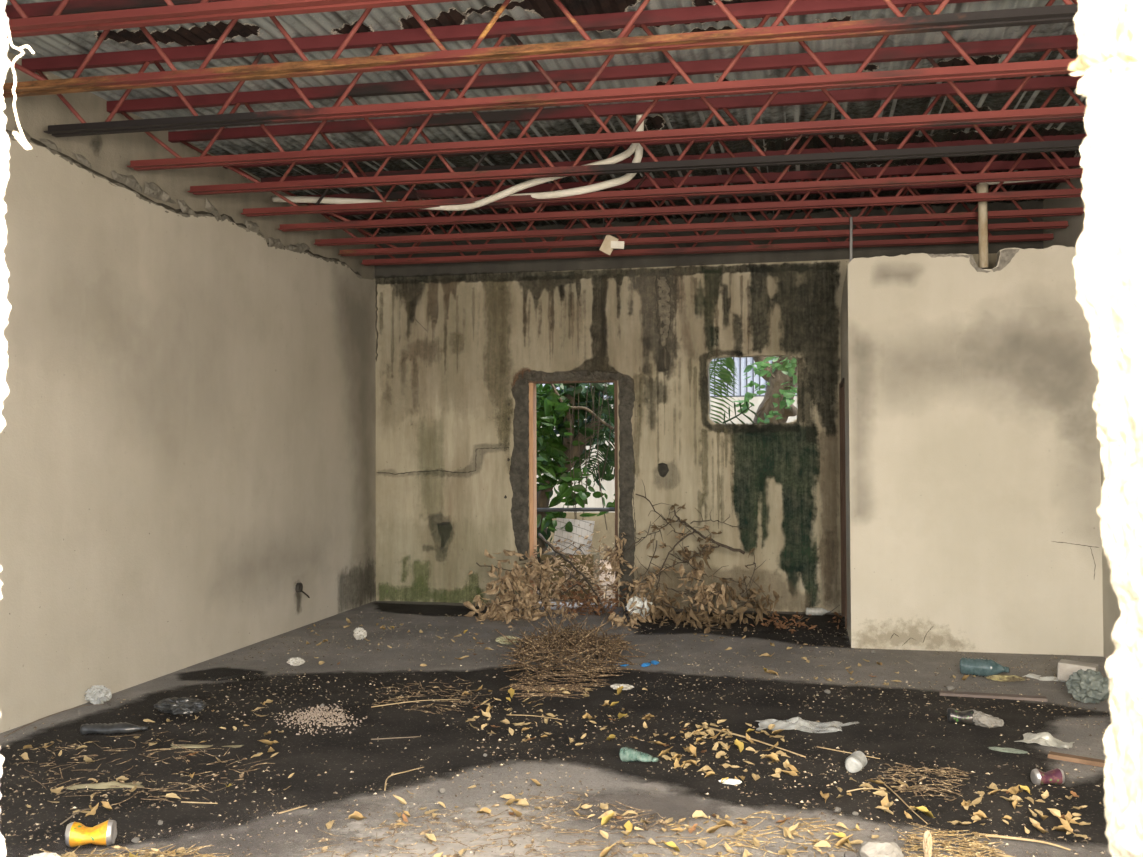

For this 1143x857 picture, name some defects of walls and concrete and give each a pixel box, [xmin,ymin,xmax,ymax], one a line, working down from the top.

peeling [5,126,363,279]
water stain [391,281,459,334]
water stain [484,271,678,438]
water stain [699,265,840,519]
crack [376,447,509,475]
water stain [759,478,769,540]
water stain [402,558,429,591]